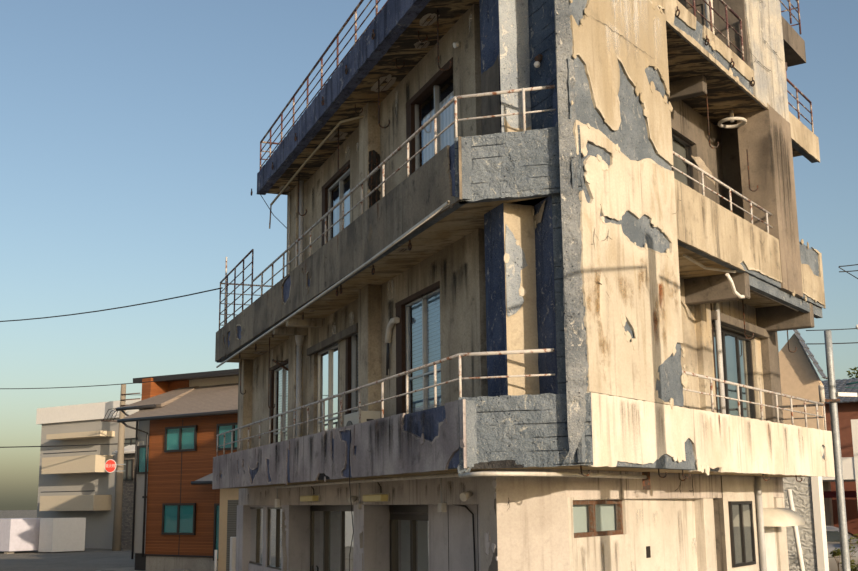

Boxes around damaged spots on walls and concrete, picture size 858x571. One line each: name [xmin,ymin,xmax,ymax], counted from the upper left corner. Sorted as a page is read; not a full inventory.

peeling [568,0,590,26]
spalling [674,16,753,94]
peeling [568,53,673,258]
peeling [692,156,717,188]
peeling [503,224,528,316]
peeling [654,343,688,409]
peeling [403,406,447,445]
peeling [322,426,357,477]
spalling [616,439,720,475]
peeling [484,532,498,571]